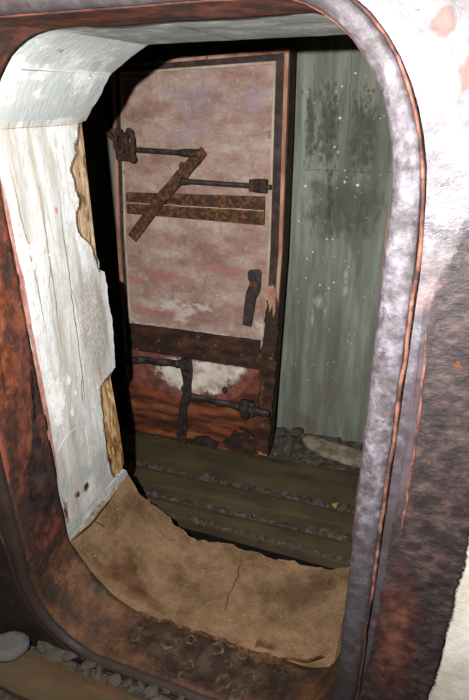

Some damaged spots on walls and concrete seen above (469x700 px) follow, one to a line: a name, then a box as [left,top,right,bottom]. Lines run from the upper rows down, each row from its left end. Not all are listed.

flaking render [70,123,100,272]
water stain [306,84,338,161]
water stain [351,99,376,172]
rust [0,183,56,467]
flaking render [80,374,126,532]
rust [358,234,469,700]
rust [105,558,155,606]
crack [218,553,242,623]